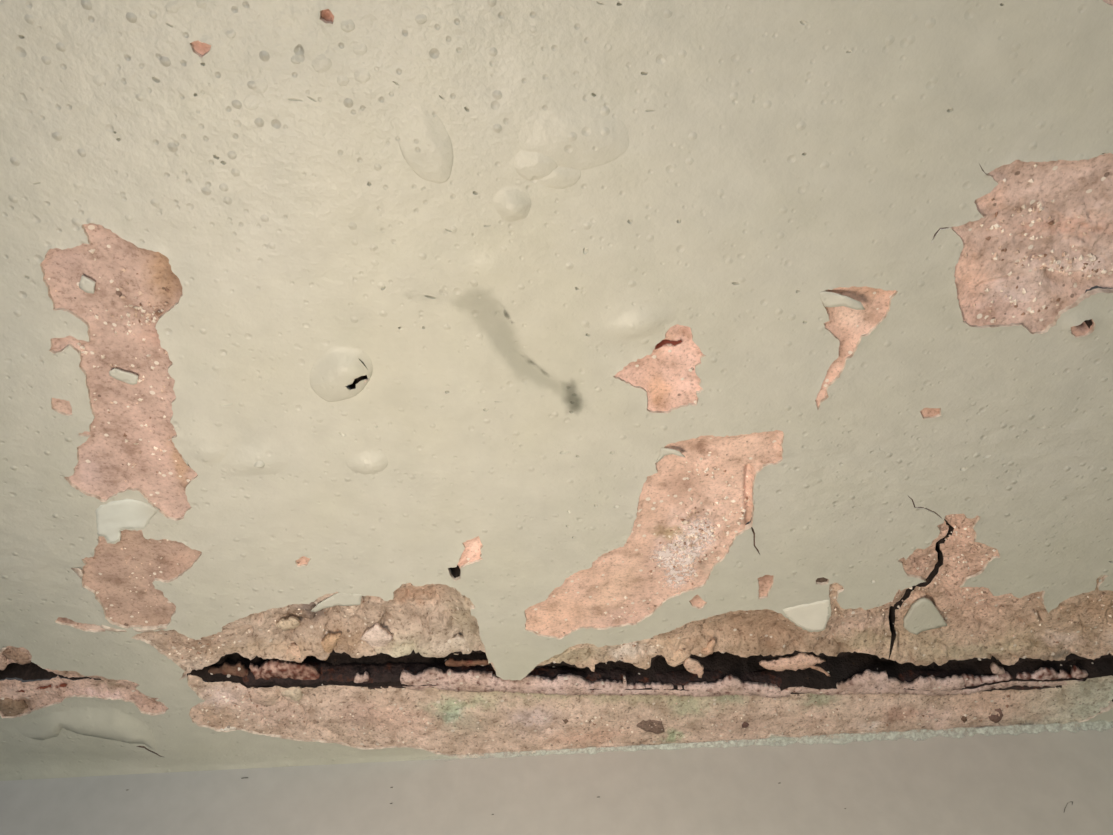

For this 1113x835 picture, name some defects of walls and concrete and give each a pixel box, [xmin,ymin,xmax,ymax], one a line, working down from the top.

spalling [951,153,1113,334]
spalling [0,223,1113,759]
crack [907,495,942,519]